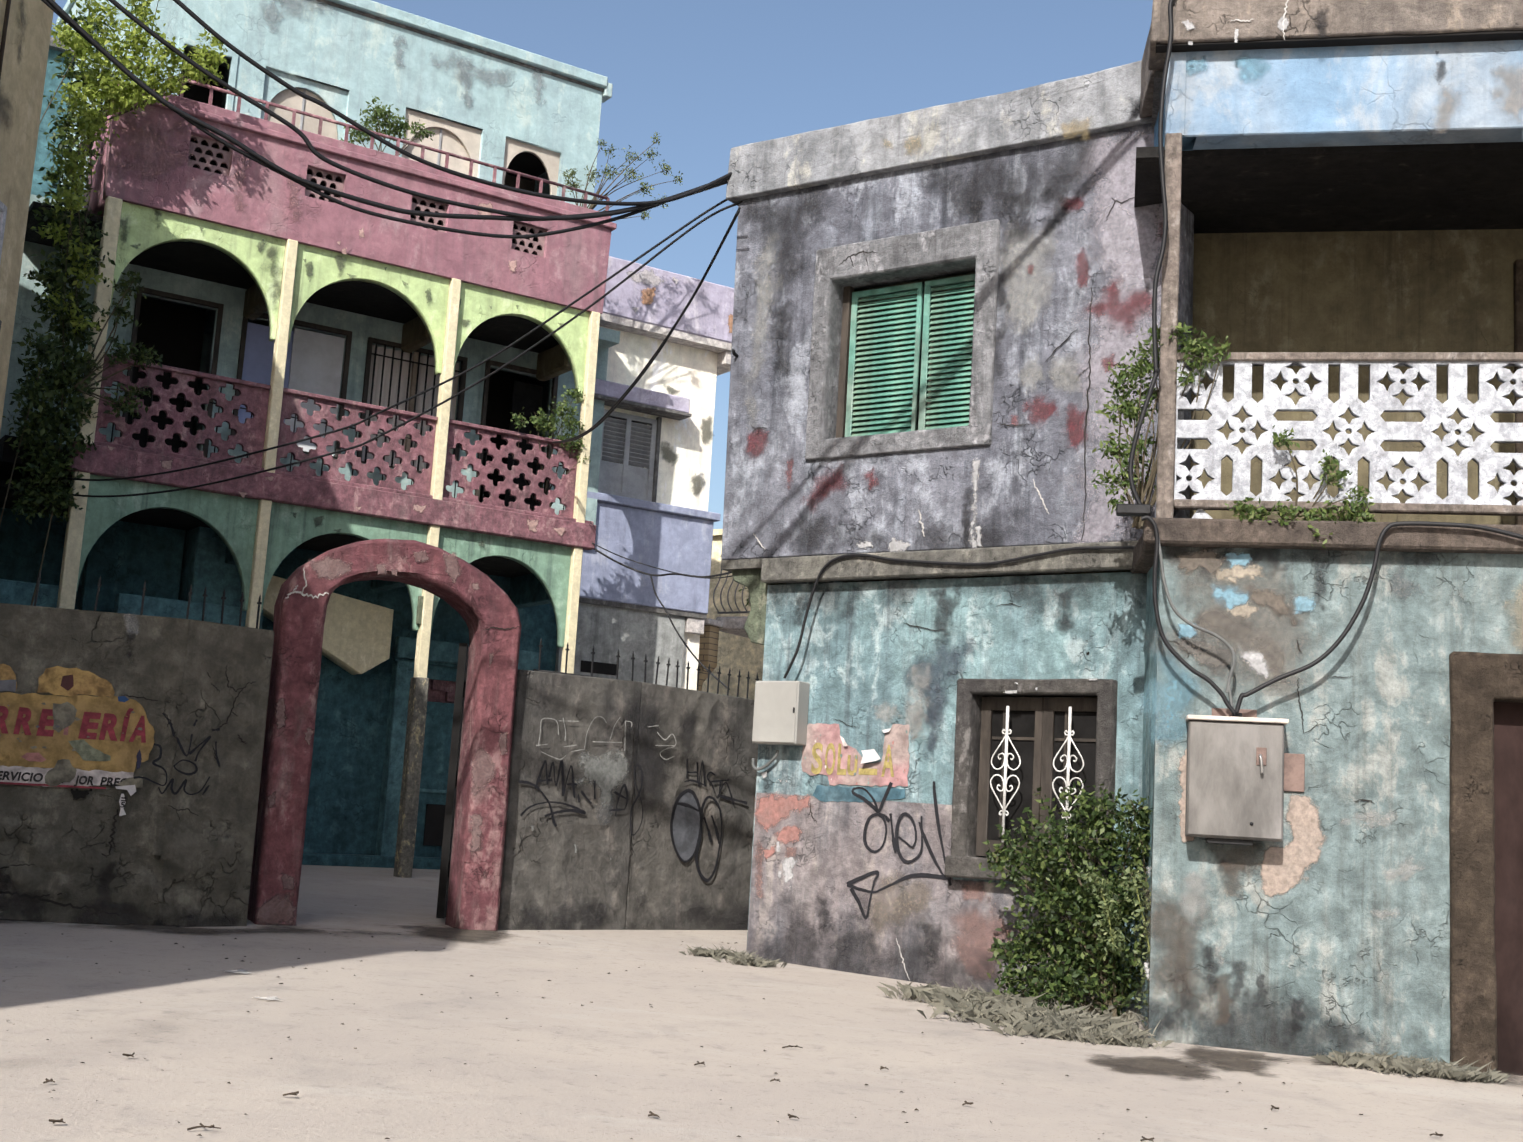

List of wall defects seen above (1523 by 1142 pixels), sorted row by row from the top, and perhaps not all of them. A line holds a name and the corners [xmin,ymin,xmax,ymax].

damp [747,195,819,277]
damp [938,147,1085,238]
peeling [1011,101,1163,543]
damp [962,460,1000,548]
crack [286,569,329,599]
crack [122,666,254,767]
crack [0,863,120,917]
crack [102,810,119,858]
damp [78,863,322,934]
peeling [755,771,810,897]
peeling [1261,795,1325,897]
damp [1090,962,1364,1080]